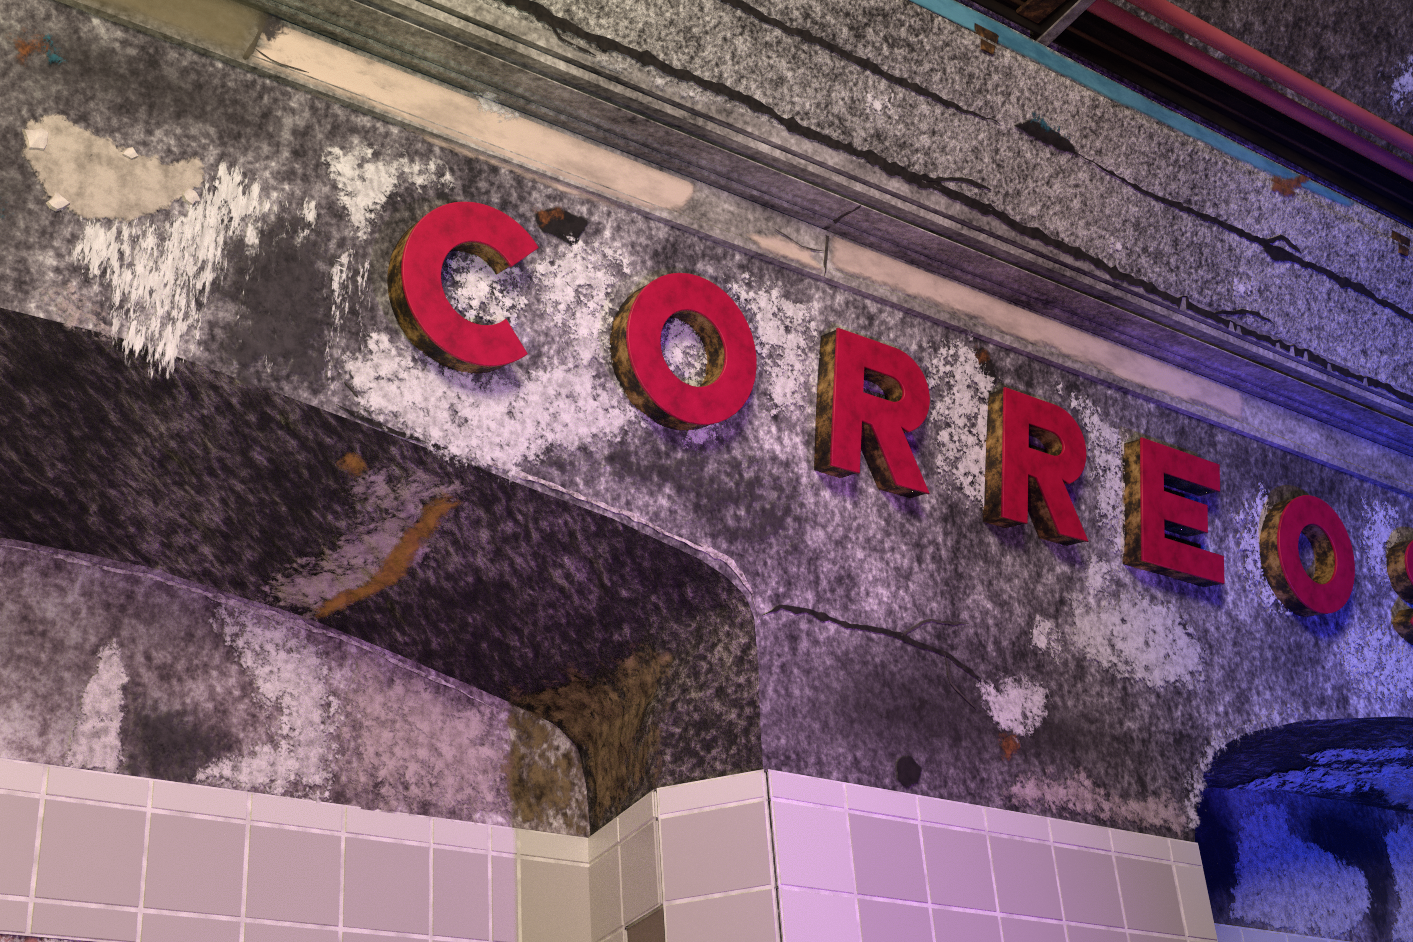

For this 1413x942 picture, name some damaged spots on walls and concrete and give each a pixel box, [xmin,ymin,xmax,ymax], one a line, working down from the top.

crack [243,17,309,73]
flaking render [22,115,206,223]
crack [502,0,1413,403]
leakage [63,160,370,391]
rust [343,453,366,475]
crack [336,375,485,471]
rust [315,495,459,617]
crack [762,604,1000,708]
rust [501,644,672,834]